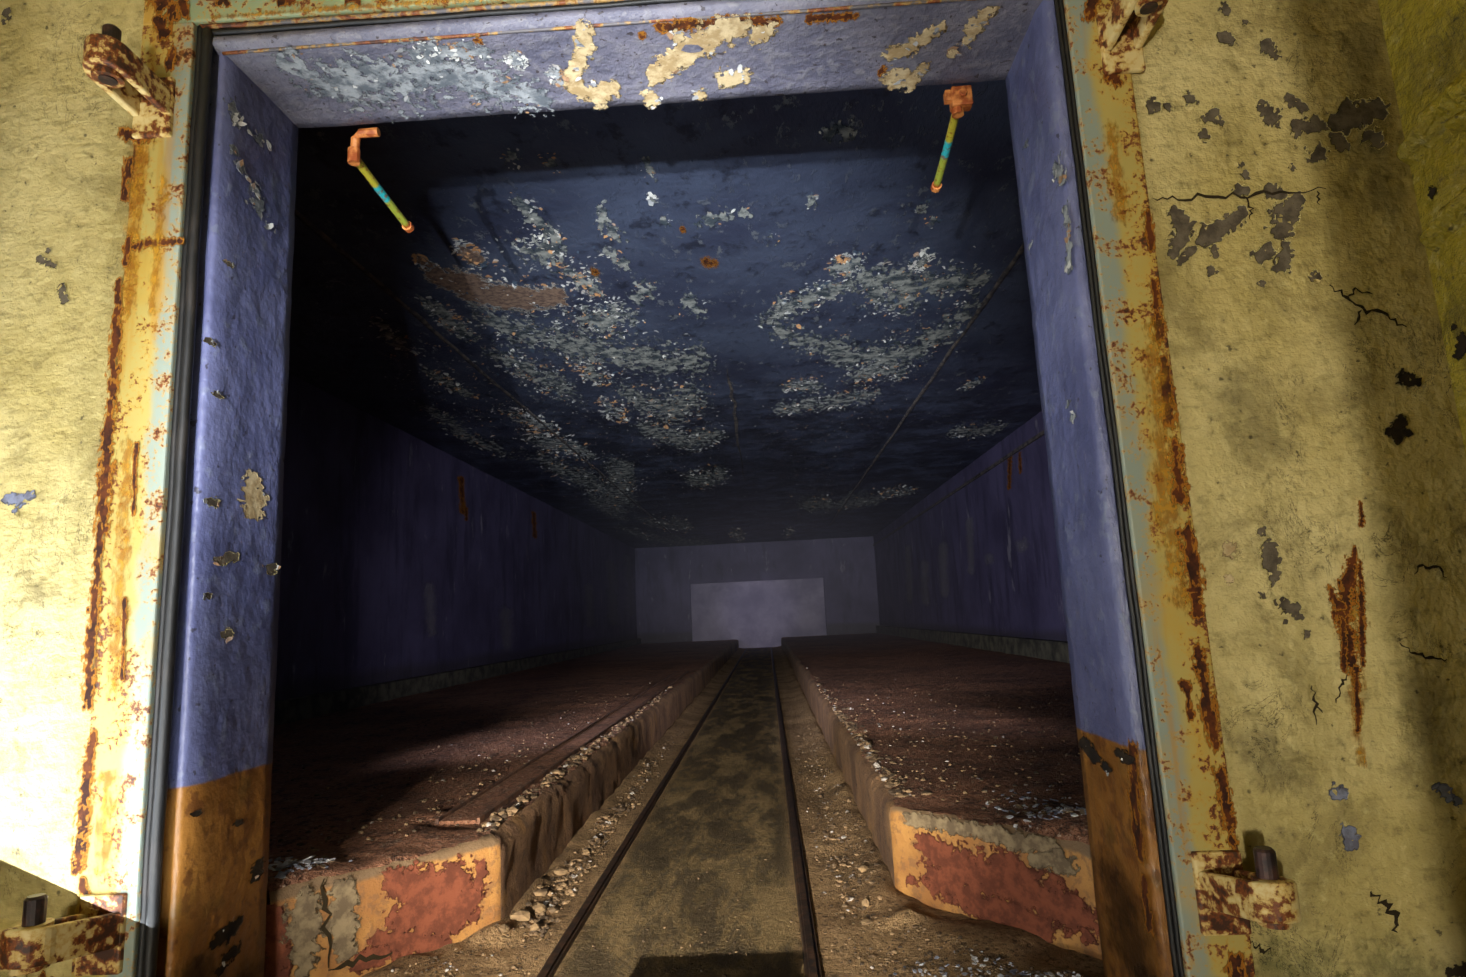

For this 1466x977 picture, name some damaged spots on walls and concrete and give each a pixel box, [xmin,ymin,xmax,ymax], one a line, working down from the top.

peeling [268,13,779,123]
rust [638,12,783,41]
peeling [879,6,1000,93]
peeling [1143,89,1226,143]
crack [1153,187,1326,219]
peeling [1165,91,1392,288]
rust [70,125,184,896]
peeling [358,192,740,521]
peeling [754,246,1010,442]
rust [1144,277,1207,620]
rust [1177,640,1240,850]
rust [1326,545,1367,766]